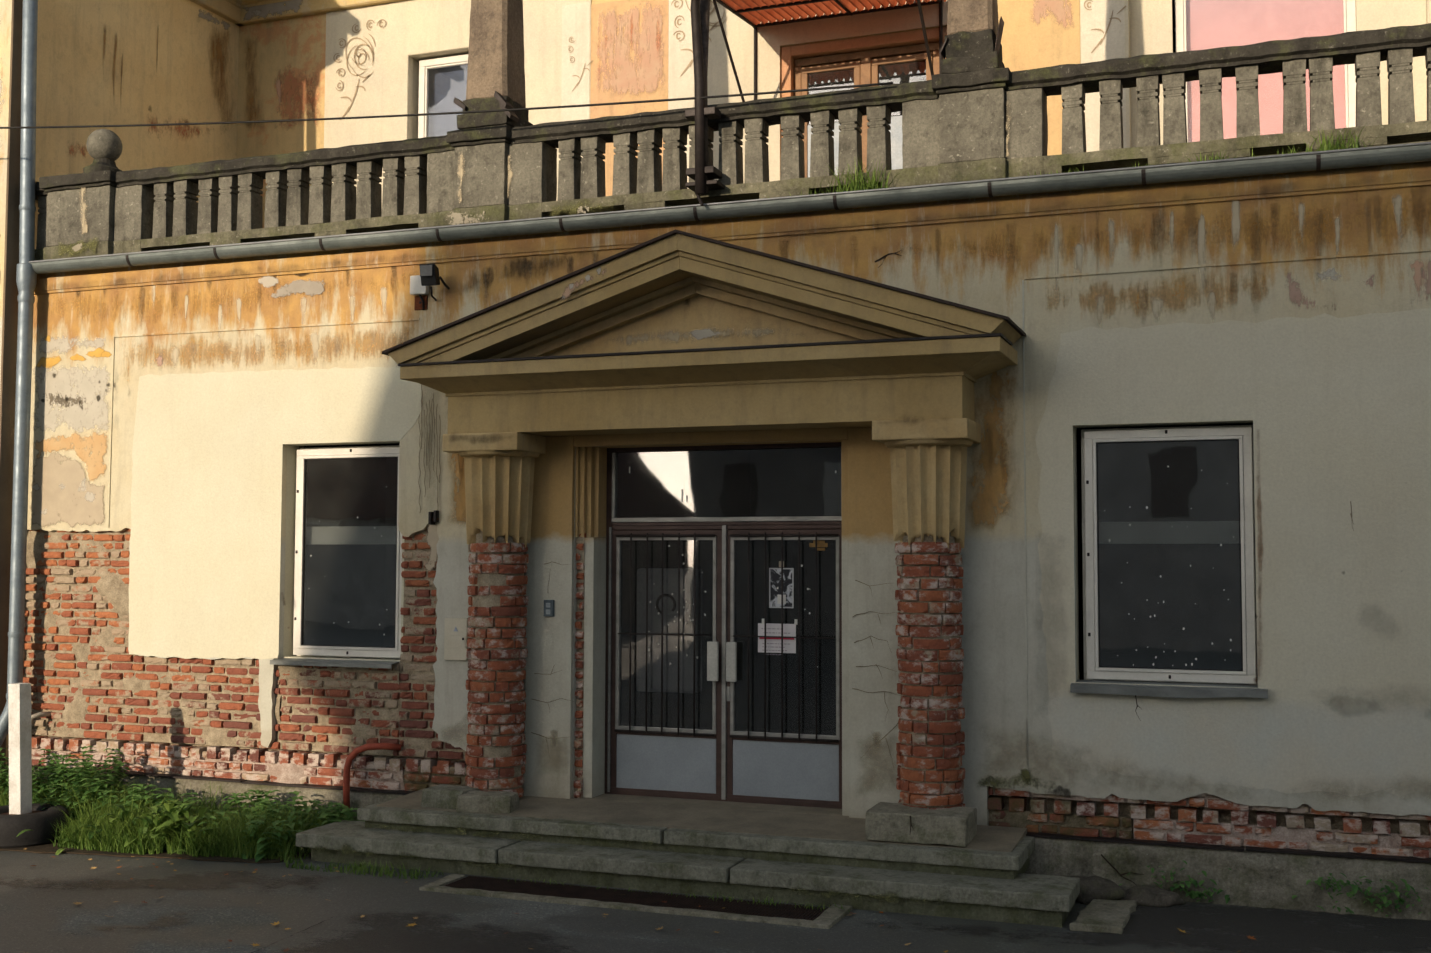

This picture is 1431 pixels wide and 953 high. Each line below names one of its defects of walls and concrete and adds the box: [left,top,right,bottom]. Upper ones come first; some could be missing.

damp [133,334,403,366]
spalling [23,335,529,797]
crack [852,580,898,768]
spalling [895,542,966,809]
spalling [987,786,1431,858]